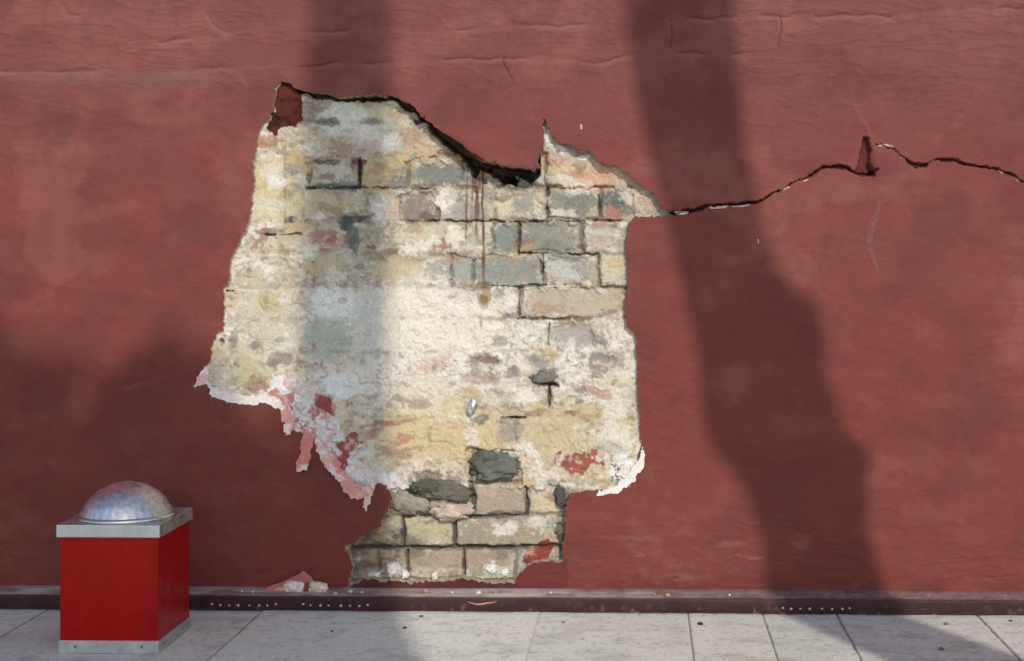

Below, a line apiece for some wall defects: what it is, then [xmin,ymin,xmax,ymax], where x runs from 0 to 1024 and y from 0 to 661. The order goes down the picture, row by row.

spalling [194,82,672,585]
crack [669,143,1024,215]